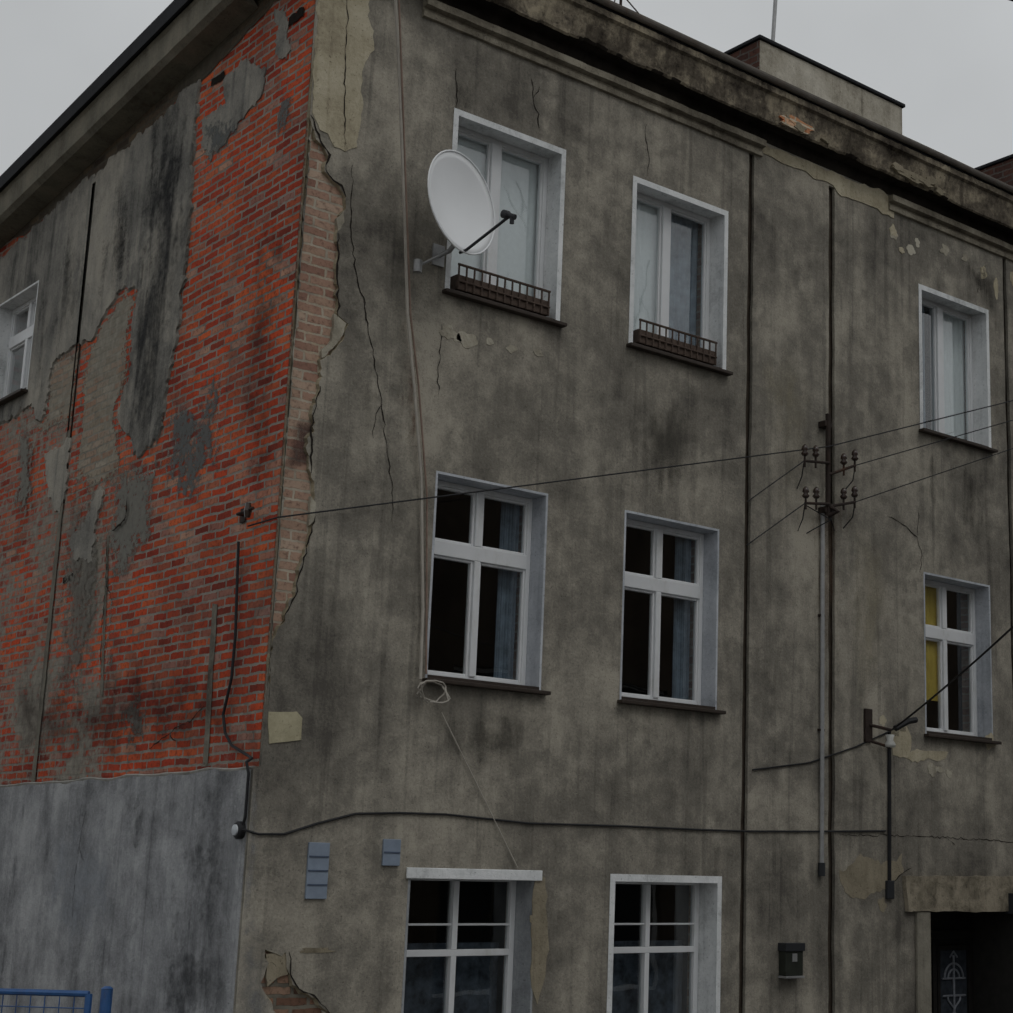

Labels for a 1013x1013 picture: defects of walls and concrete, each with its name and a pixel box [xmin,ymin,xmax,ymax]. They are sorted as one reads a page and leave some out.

flaking render [0,0,374,784]
crack [344,7,394,514]
flaking render [762,145,920,255]
flaking render [261,948,335,1013]